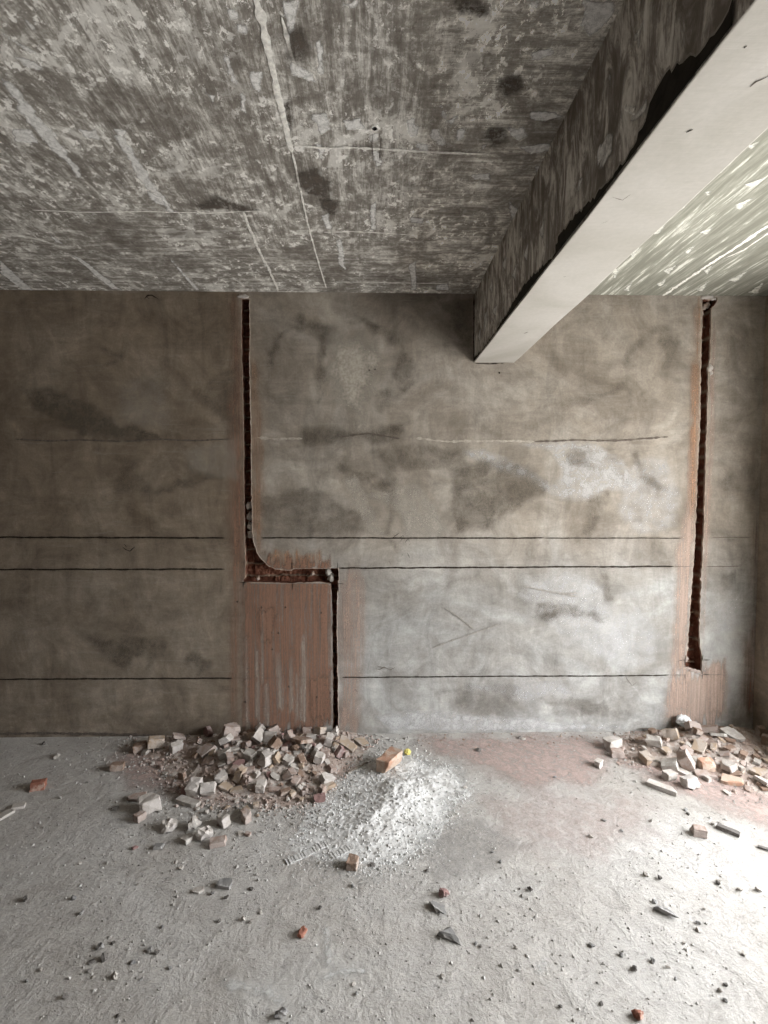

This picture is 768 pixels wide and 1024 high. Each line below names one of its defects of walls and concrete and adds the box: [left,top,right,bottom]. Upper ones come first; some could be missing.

peeling [454,0,488,16]
peeling [407,105,465,150]
flaking render [474,0,733,361]
peeling [736,179,761,209]